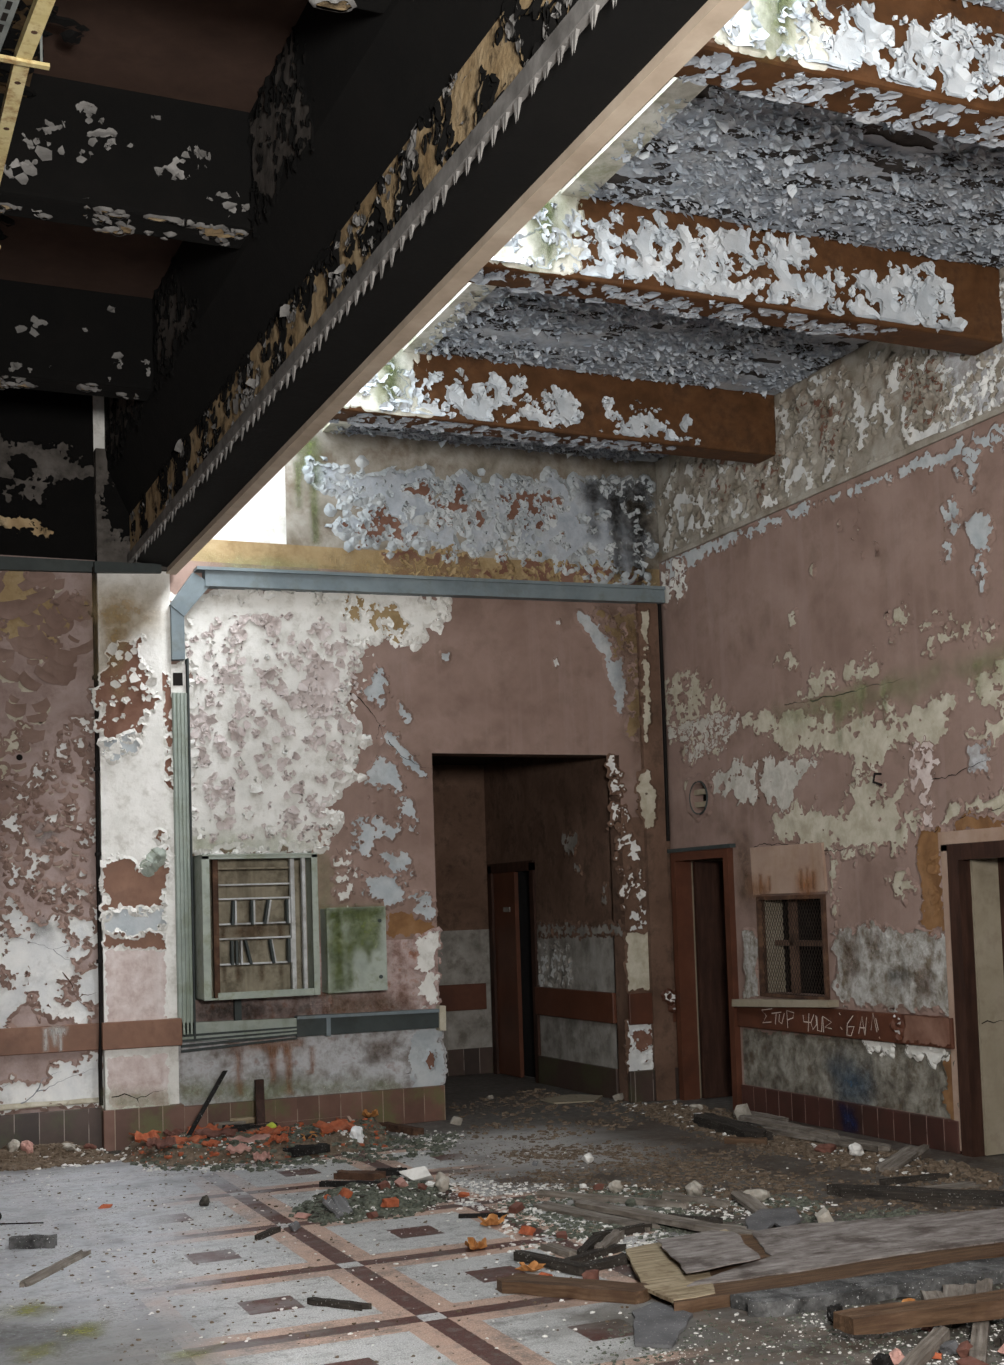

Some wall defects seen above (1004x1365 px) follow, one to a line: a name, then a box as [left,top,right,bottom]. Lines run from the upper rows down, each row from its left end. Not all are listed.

peeling [275,299,302,329]
peeling [130,339,282,541]
mould [589,484,648,581]
peeling [301,0,1004,1120]
peeling [0,589,453,1028]
peeling [0,1050,170,1115]